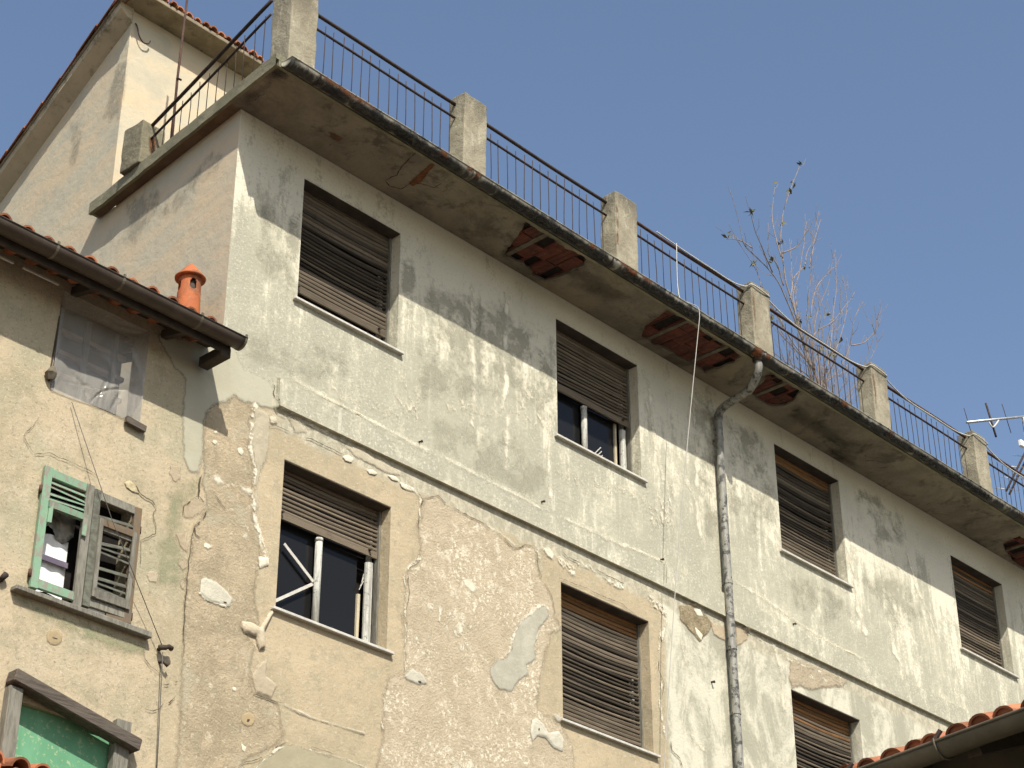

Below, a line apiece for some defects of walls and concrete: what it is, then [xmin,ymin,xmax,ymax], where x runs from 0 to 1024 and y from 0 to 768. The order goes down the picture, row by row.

spalling [505,222,585,279]
water stain [296,286,637,499]
spalling [642,310,740,371]
spalling [753,375,799,404]
spalling [176,396,365,768]
flaking render [341,439,624,768]
spalling [649,595,762,650]
water stain [844,535,868,636]
water stain [874,558,937,667]
spalling [1003,536,1024,567]